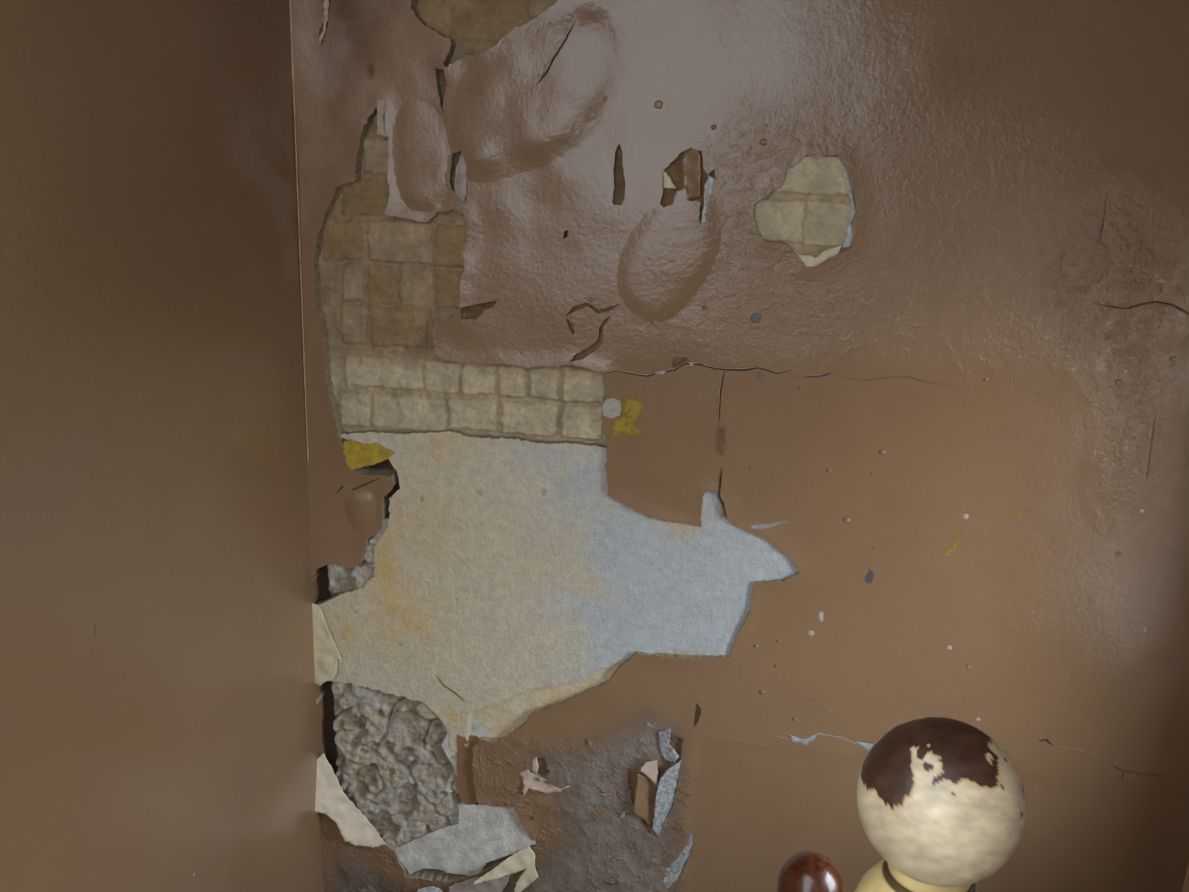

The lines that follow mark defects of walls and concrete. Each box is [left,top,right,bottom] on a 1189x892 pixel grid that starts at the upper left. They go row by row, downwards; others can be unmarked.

flaking render [416,0,558,64]
flaking render [754,154,856,267]
crack [606,360,937,421]
peeling [312,98,799,892]